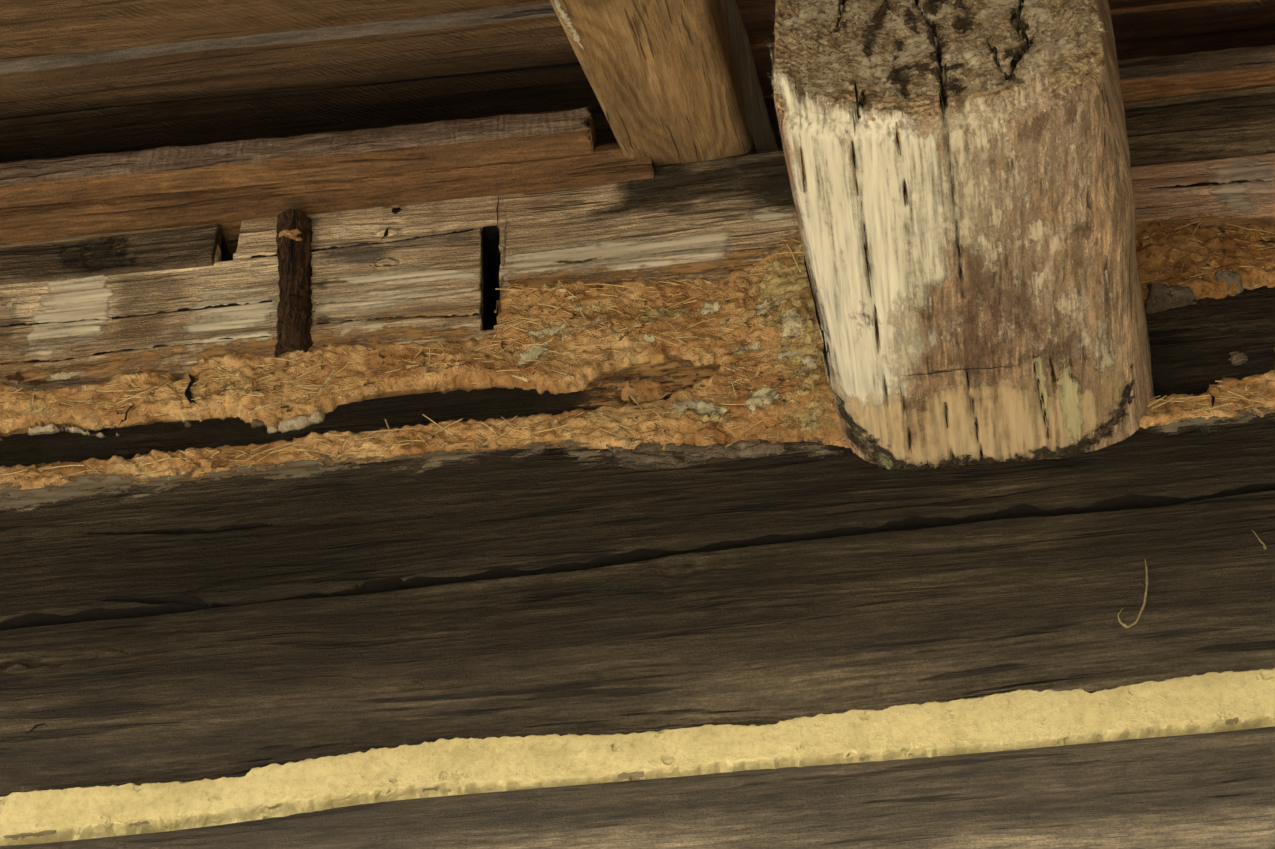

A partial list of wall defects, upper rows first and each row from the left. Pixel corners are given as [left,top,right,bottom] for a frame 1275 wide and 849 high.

crack [987,0,1032,79]
crack [915,0,963,295]
crack [0,482,1275,631]